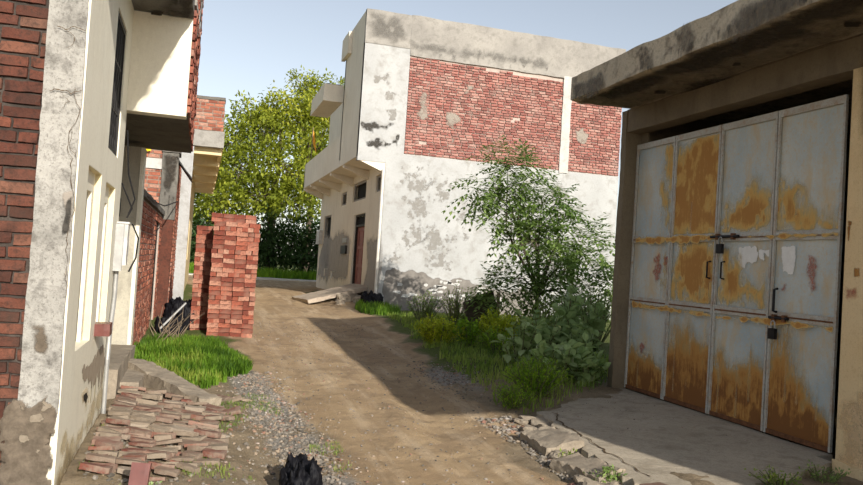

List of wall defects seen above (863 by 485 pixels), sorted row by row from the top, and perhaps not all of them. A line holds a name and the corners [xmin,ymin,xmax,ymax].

damp [376,16,403,37]
damp [573,0,863,108]
mould [361,92,399,148]
flaking render [404,56,622,177]
spalling [382,167,540,316]
rust [627,134,852,447]
peeling [82,345,105,410]
spalling [0,396,57,485]
crack [552,412,649,476]